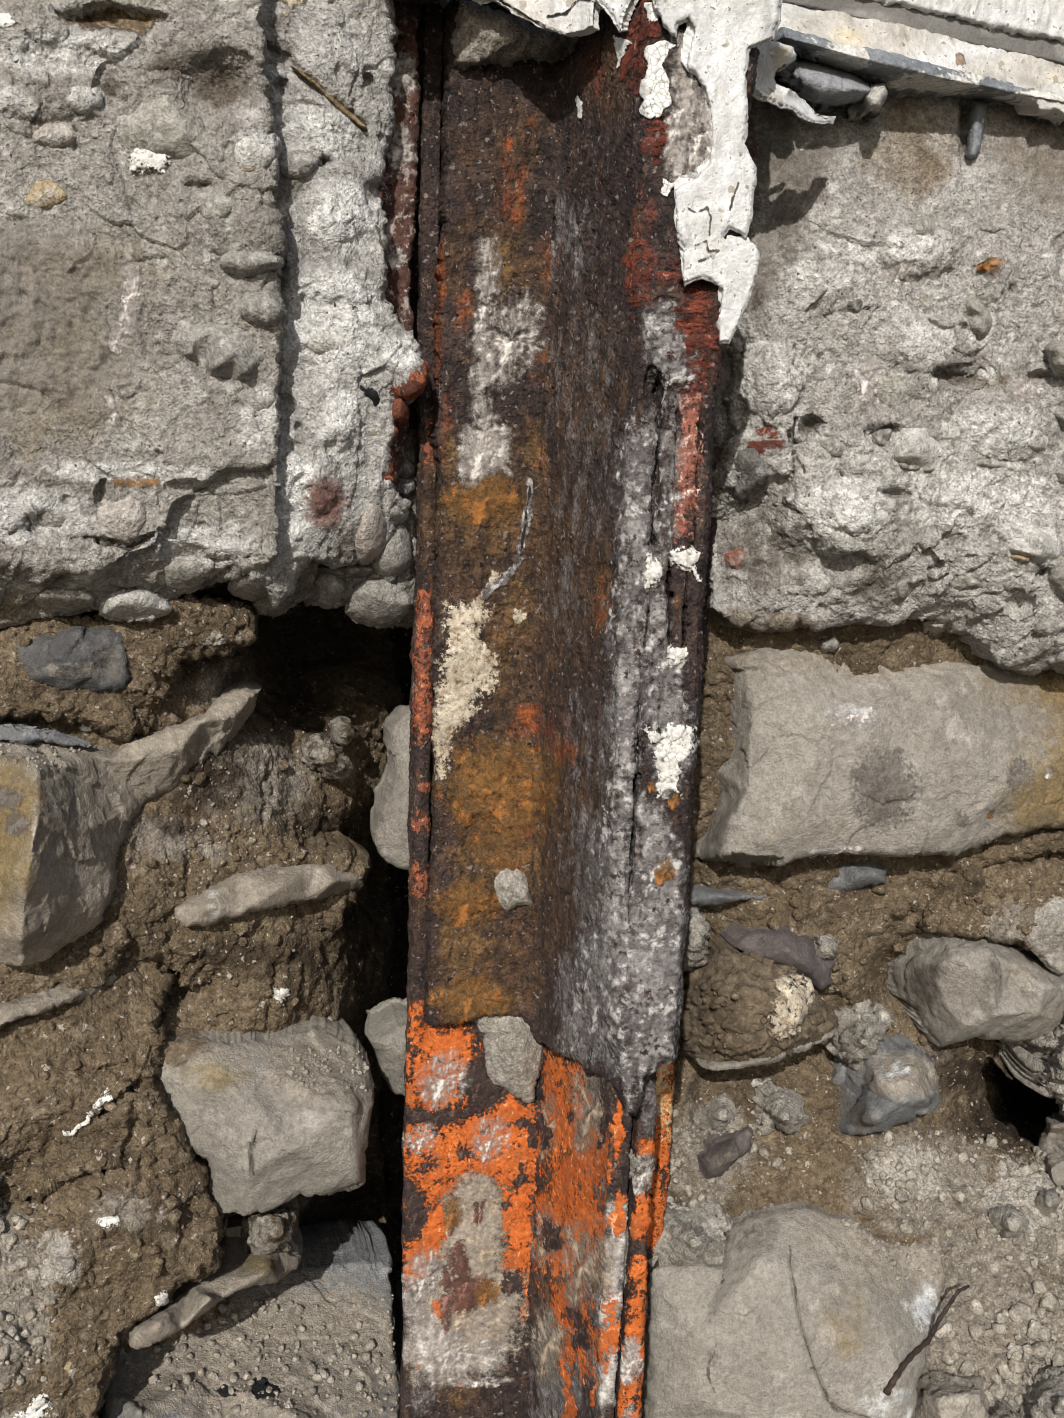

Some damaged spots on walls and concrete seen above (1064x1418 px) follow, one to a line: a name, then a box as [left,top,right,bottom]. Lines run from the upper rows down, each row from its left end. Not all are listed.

peeling [644,2,659,22]
peeling [575,95,583,118]
peeling [613,29,712,196]
peeling [752,41,836,124]
corrosion [621,236,724,546]
corrosion [439,477,525,525]
damp [431,570,501,780]
damp [513,608,527,624]
crack [643,605,668,670]
corrosion [431,731,562,927]
corrosion [596,1075,618,1149]
corrosion [401,1046,564,1331]